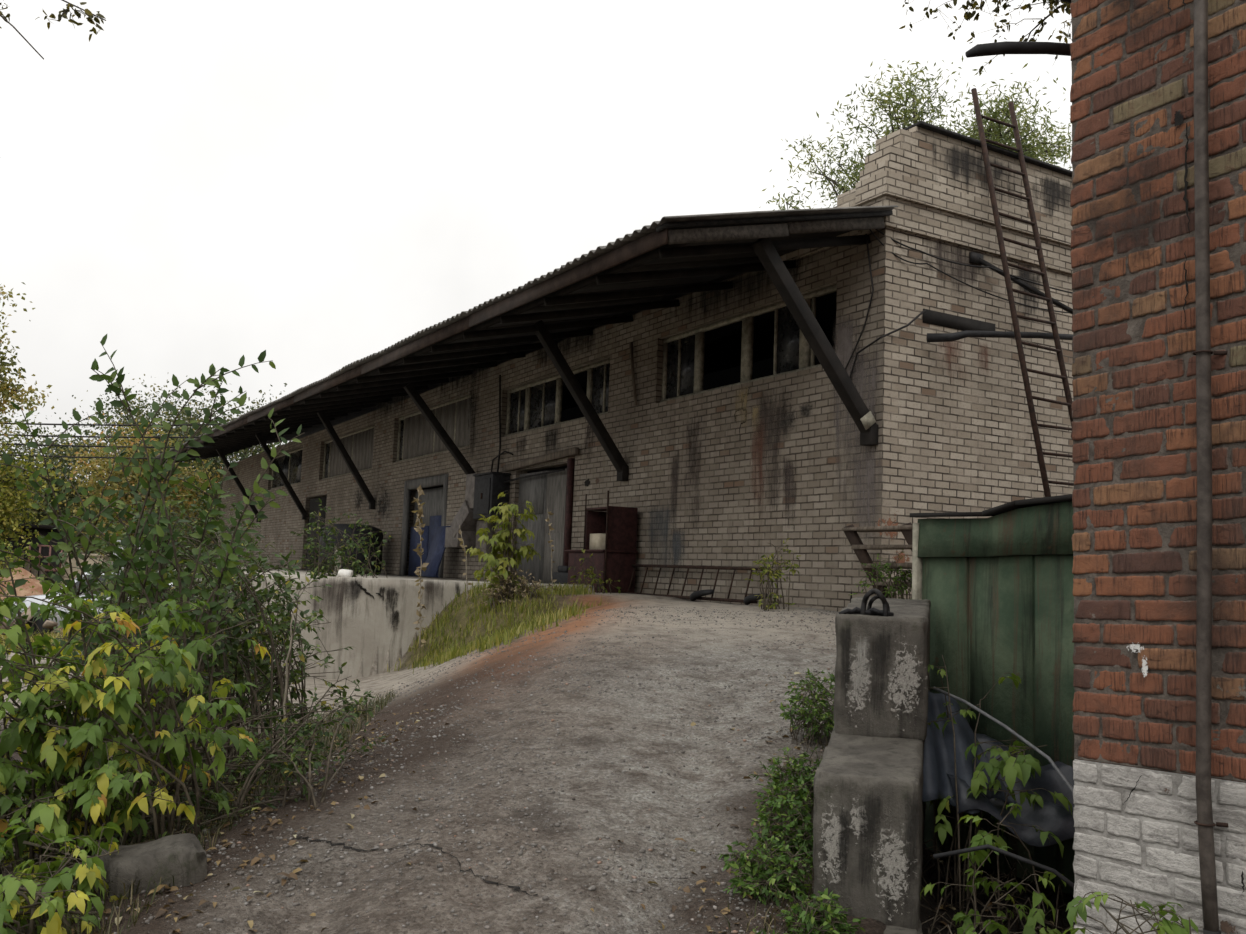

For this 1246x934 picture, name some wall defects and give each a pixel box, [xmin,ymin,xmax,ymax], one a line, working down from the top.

leakage [650,417,701,565]
leakage [739,389,812,509]
leakage [840,628,851,685]
crack [296,836,538,896]
leakage [839,797,880,882]